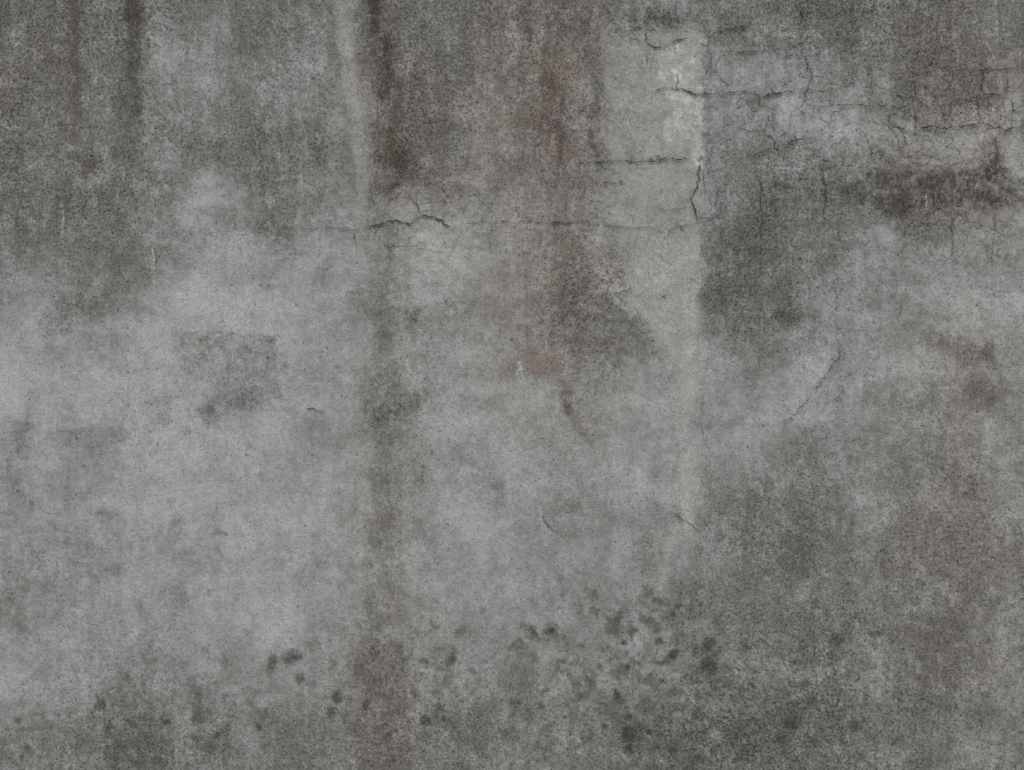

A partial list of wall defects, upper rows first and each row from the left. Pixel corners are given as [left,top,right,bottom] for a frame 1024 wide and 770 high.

crack [315,155,714,274]
crack [600,0,688,49]
leakage [610,36,707,205]
crack [655,24,1023,144]
leakage [842,140,1023,213]
leakage [633,227,701,405]